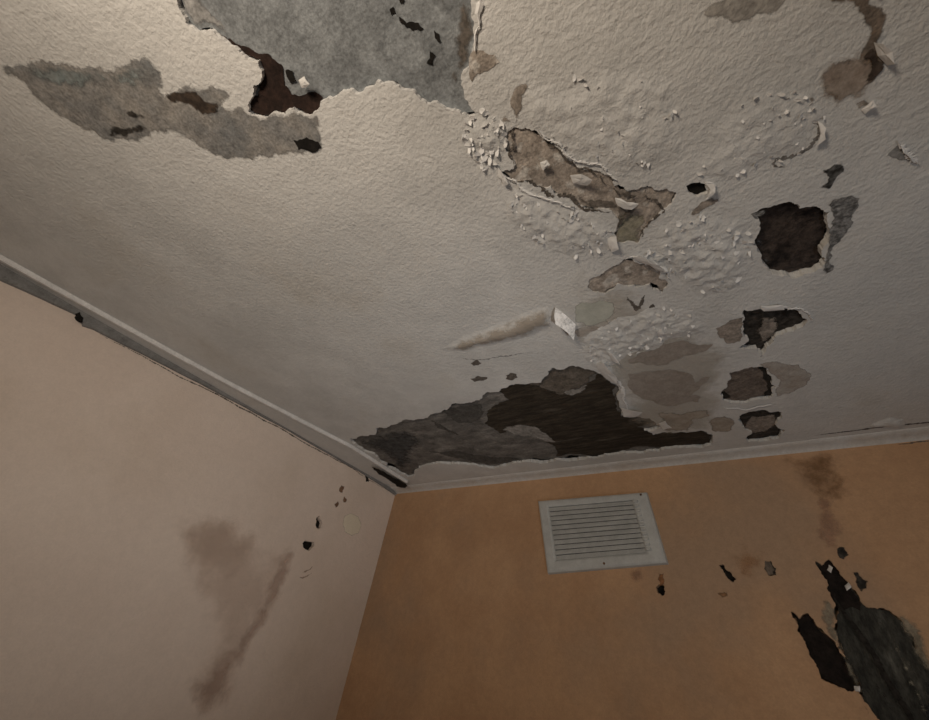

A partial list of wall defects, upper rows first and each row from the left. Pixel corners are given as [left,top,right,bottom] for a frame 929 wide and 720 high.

spalling [4,0,500,160]
peeling [705,0,785,23]
peeling [822,0,895,114]
peeling [498,84,675,252]
peeling [823,164,844,189]
spalling [751,196,859,273]
peeling [554,255,671,340]
spalling [353,305,813,475]